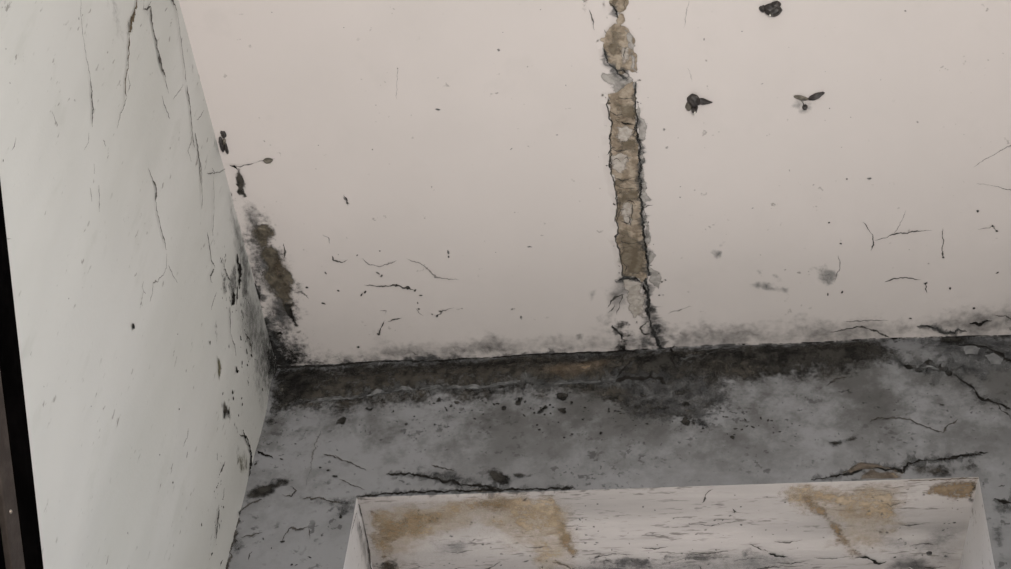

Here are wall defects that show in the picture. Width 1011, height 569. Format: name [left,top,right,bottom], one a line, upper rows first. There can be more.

crack [80,0,215,279]
flaking render [584,0,666,318]
crack [863,214,944,258]
crack [247,218,730,423]
water stain [277,293,1011,427]
crack [834,307,1011,415]
water stain [242,479,341,510]
crack [306,431,586,515]
water stain [373,498,577,569]
water stain [792,486,893,551]
crack [811,404,988,480]
crack [856,548,947,569]